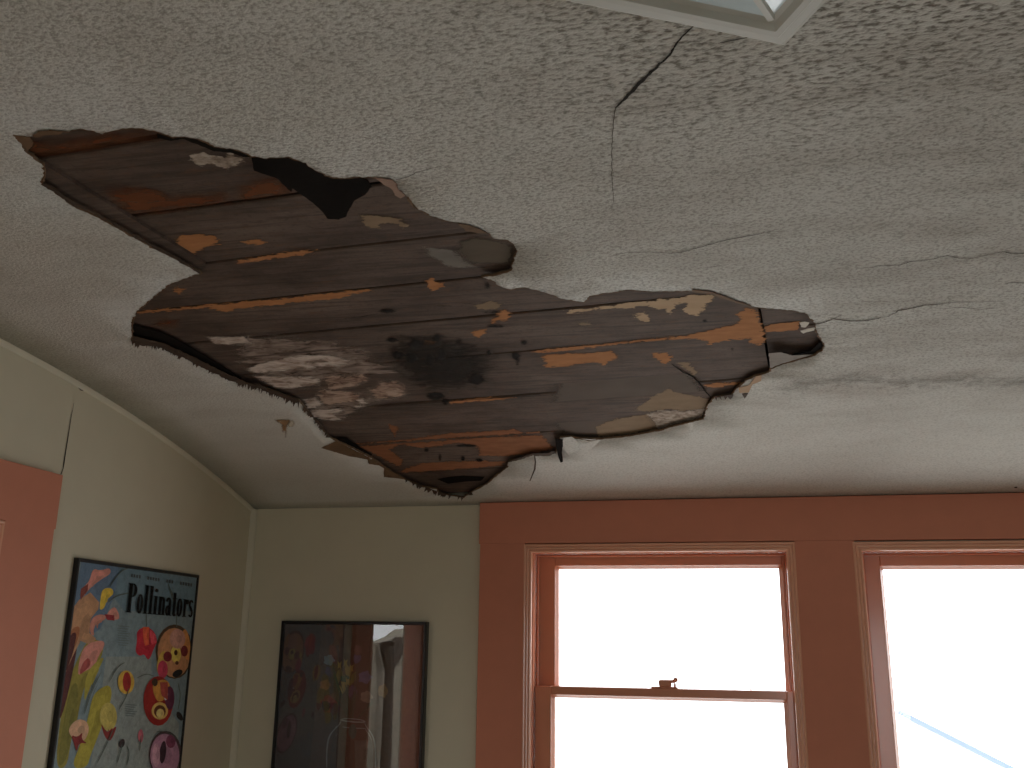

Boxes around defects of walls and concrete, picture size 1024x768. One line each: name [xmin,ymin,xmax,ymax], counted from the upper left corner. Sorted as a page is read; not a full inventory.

crack [611,26,693,201]
water stain [209,335,491,420]
peeling [14,128,825,501]
crack [815,282,1019,325]